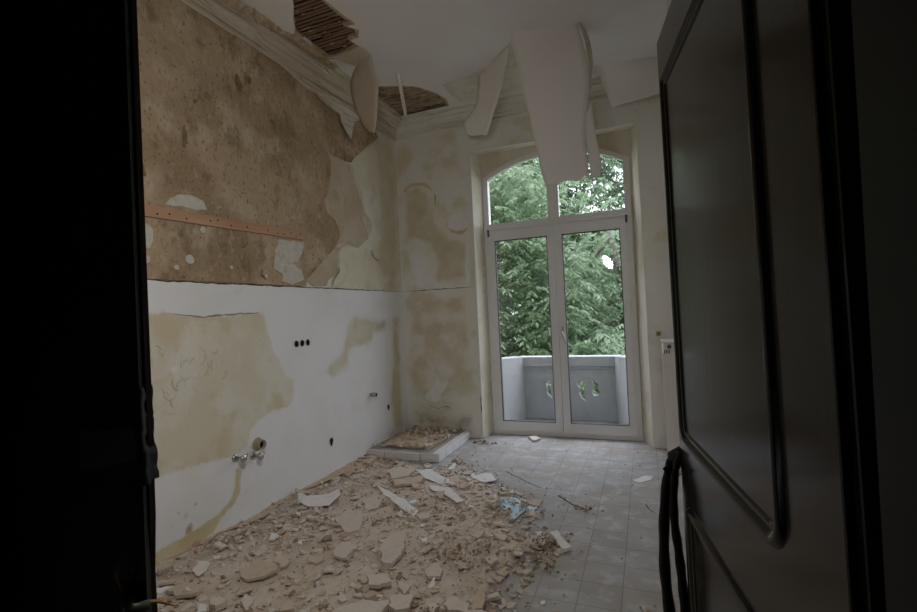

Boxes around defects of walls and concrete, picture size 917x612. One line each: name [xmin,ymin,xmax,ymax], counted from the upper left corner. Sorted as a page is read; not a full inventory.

flaking render [137,0,378,286]
damp [374,141,487,351]
damp [149,310,295,480]
damp [327,295,492,430]
damp [155,468,242,566]